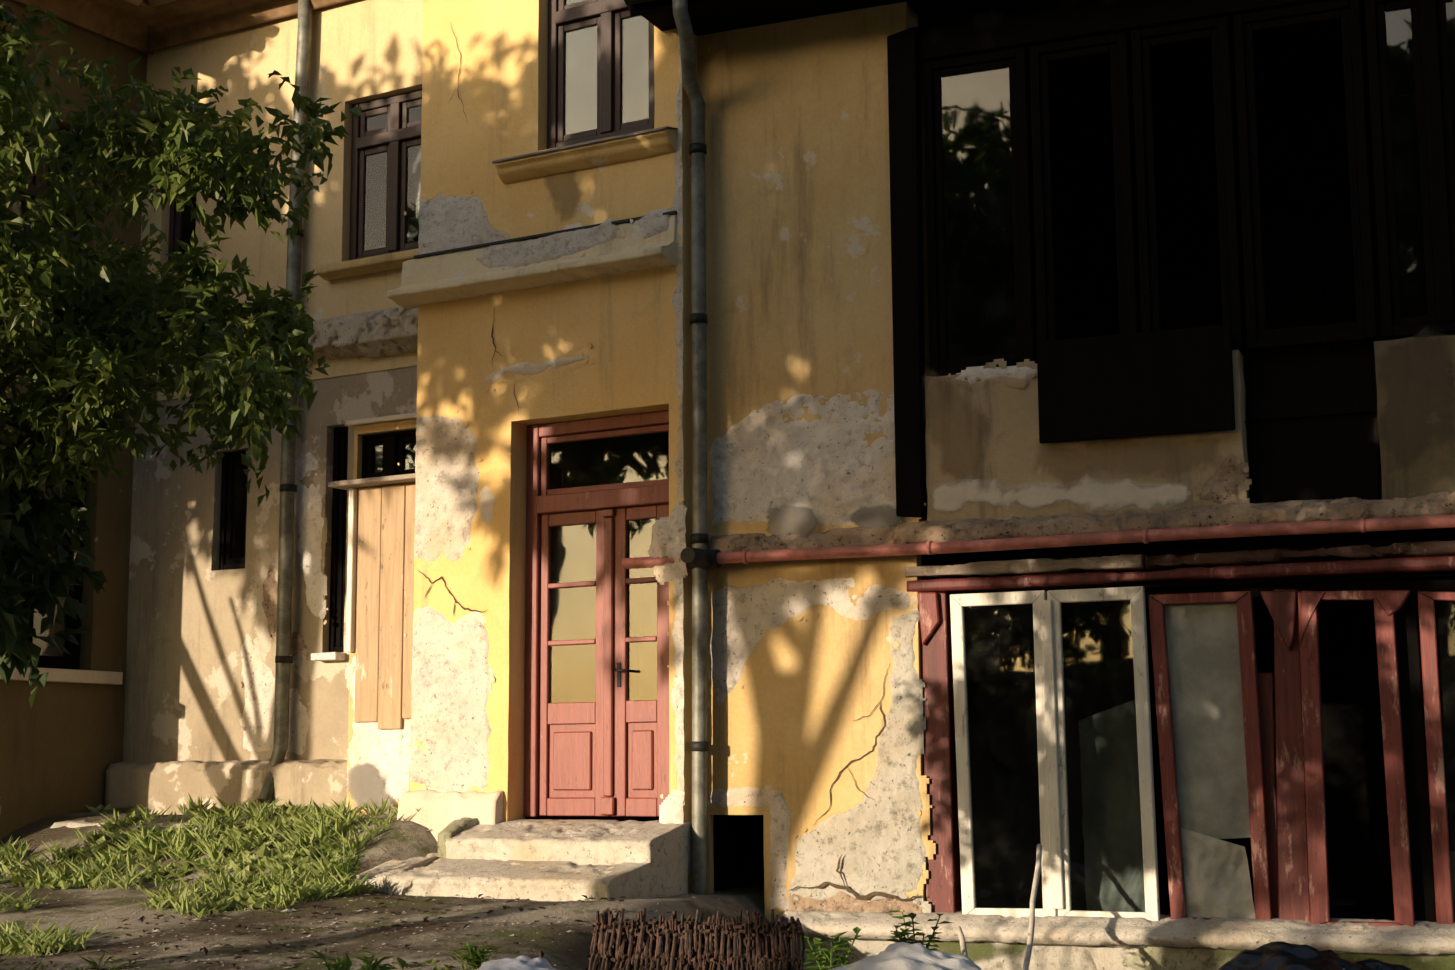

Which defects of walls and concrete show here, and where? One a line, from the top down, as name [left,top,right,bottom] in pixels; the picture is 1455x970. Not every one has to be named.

spalling [396,34,688,824]
spalling [707,387,926,534]
peeling [948,359,1038,393]
spalling [1179,450,1252,508]
spalling [238,453,328,755]
crack [418,570,486,616]
spalling [345,606,496,809]
spalling [707,572,936,915]
crack [813,664,890,826]